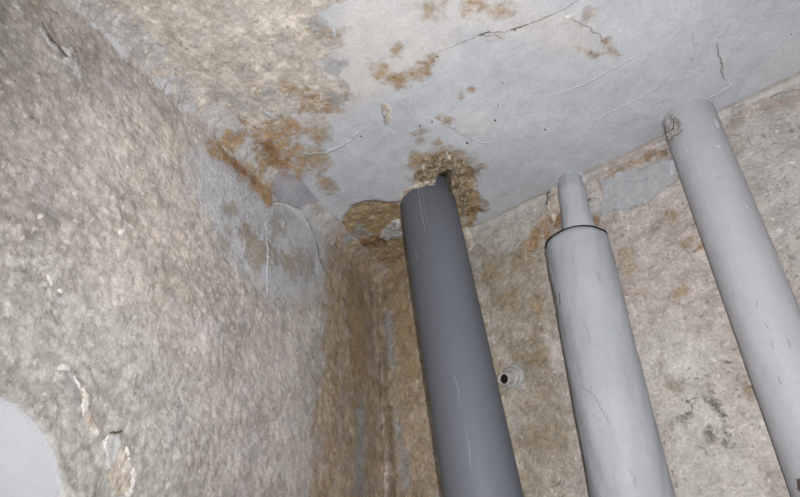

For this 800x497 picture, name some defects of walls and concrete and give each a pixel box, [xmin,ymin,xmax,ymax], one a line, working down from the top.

crack [436,0,606,53]
crack [705,21,734,100]
crack [264,200,324,295]
peeling [335,151,471,281]
flaking render [57,363,137,497]
damp [302,239,438,497]